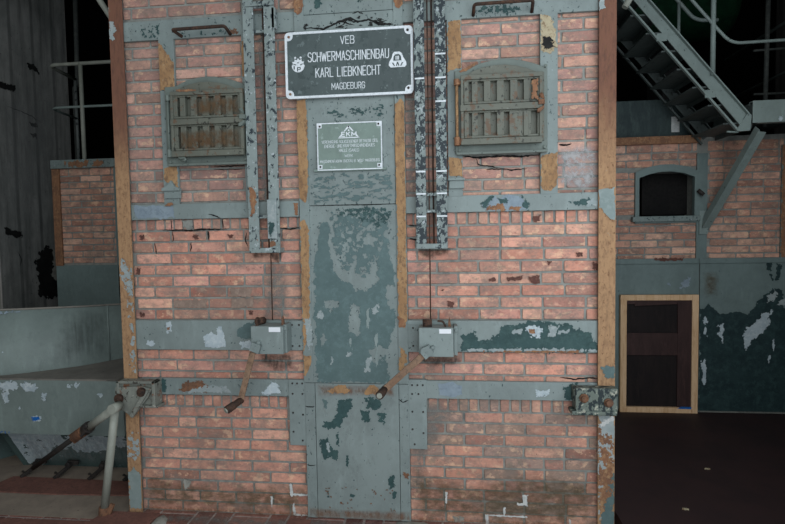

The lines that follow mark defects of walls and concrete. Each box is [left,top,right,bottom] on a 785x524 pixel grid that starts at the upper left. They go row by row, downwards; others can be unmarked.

crack [465,155,536,171]
peeling [304,172,397,384]
peeling [460,320,598,355]
peeling [698,263,785,412]
peeling [0,380,47,403]
peeling [0,431,142,509]
peeling [319,397,387,467]
peeling [598,416,615,524]